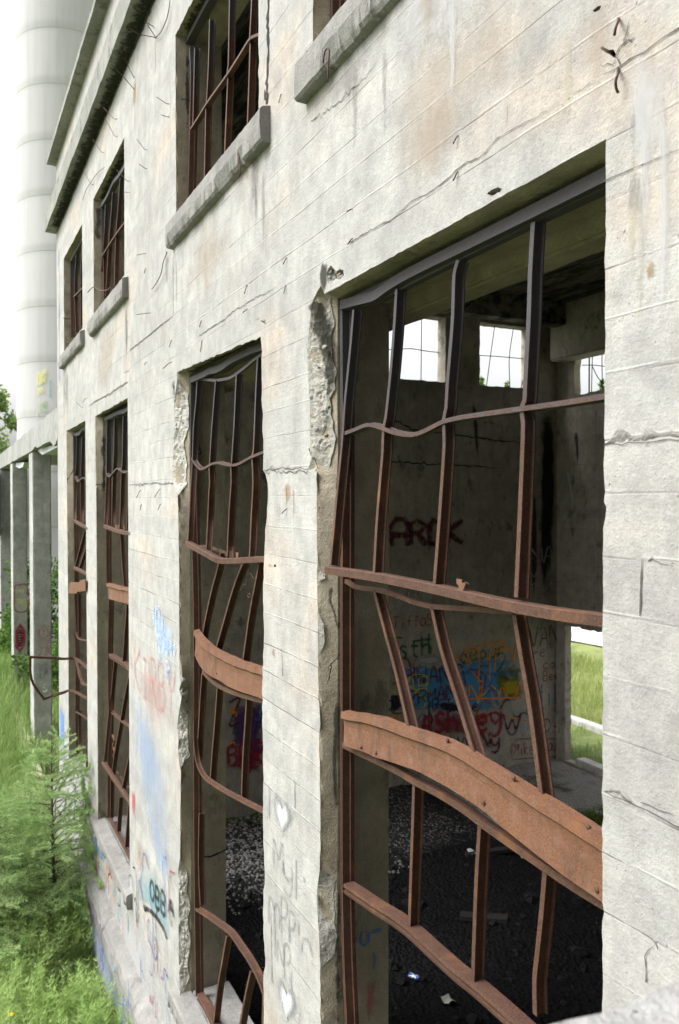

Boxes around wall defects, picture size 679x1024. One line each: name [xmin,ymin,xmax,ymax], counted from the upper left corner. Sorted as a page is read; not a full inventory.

crack [311,60,374,121]
crack [574,22,679,93]
crack [350,111,546,242]
crack [604,149,679,182]
spalling [266,264,344,471]
spalling [172,381,189,495]
crack [604,438,679,446]
spalling [317,870,337,968]